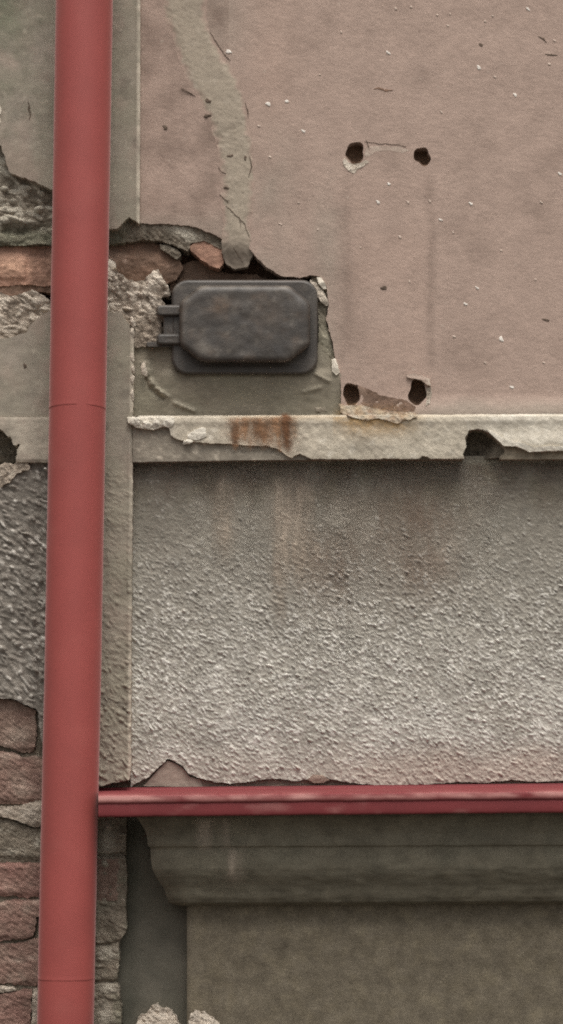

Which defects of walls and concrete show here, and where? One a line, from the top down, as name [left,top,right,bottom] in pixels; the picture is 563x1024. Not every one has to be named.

spalling [343,158,369,173]
spalling [0,148,53,339]
spalling [108,219,271,401]
spalling [310,276,340,375]
spalling [314,385,432,424]
spalling [0,432,31,488]
peeling [130,416,309,463]
rust [232,414,291,448]
spalling [463,429,563,460]
spalling [144,761,370,787]
spalling [0,699,42,1024]